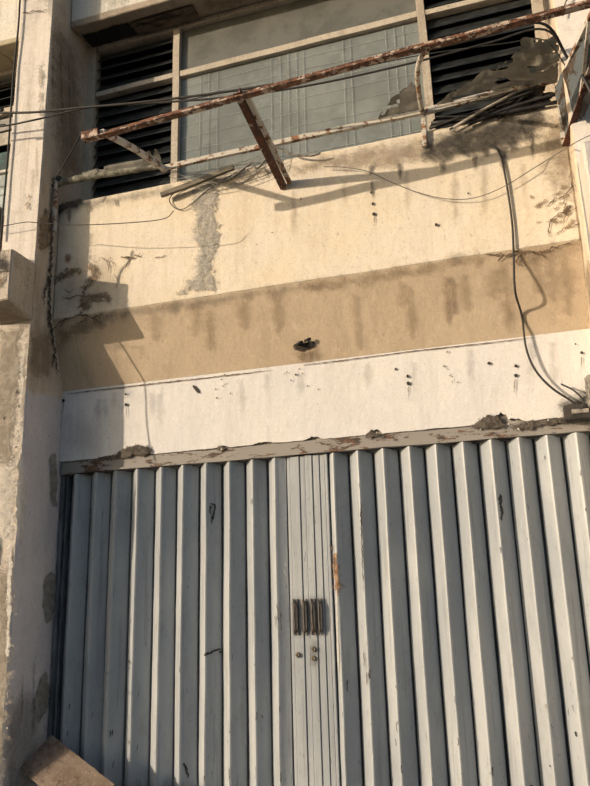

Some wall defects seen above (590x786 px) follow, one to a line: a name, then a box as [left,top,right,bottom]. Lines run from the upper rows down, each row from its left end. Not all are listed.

damp [421,109,544,169]
crack [485,152,580,266]
crack [42,210,166,377]
crack [69,370,270,394]
peeling [0,325,27,777]